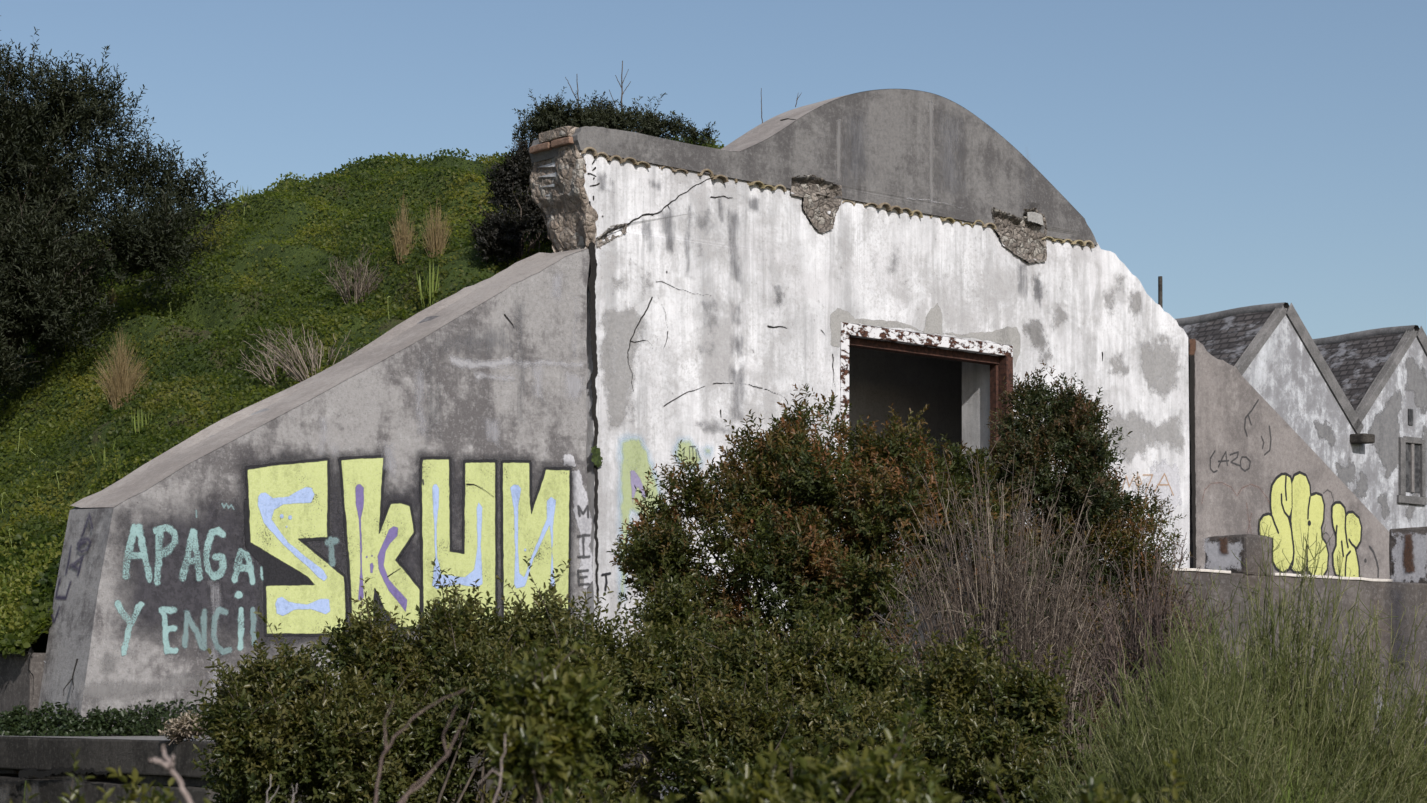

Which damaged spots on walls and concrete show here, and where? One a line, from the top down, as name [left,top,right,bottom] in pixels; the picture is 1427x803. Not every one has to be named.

spalling [529,145,627,253]
spalling [790,175,842,233]
spalling [992,207,1048,286]
peeling [1105,277,1141,314]
peeling [830,304,1067,367]
crack [588,178,785,601]
corrosion [1403,534,1415,573]